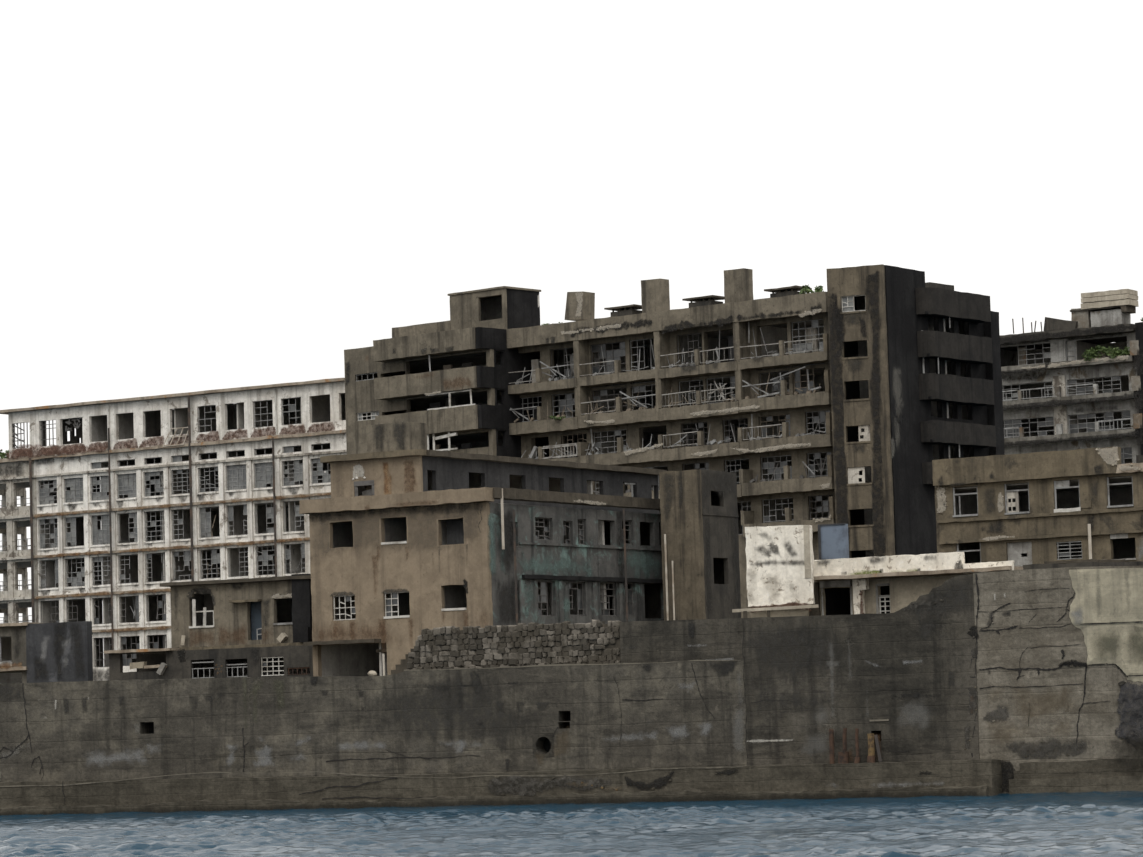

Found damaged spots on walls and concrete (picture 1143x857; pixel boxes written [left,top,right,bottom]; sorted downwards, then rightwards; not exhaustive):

crack [0,684,65,804]
crack [967,573,1128,757]